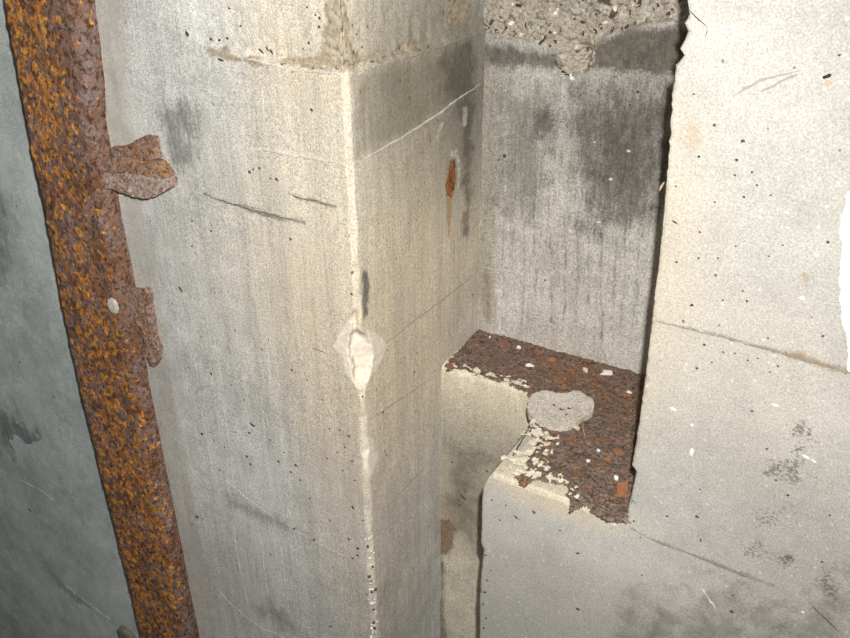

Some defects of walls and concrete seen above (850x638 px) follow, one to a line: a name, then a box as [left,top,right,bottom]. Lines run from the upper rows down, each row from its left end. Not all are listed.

damp [485,46,562,68]
damp [591,26,687,75]
damp [570,83,669,234]
crack [208,195,305,223]
crack [292,195,333,207]
rust [445,150,460,235]
spalling [332,314,389,398]
rust [445,329,646,524]
spalling [359,433,387,478]